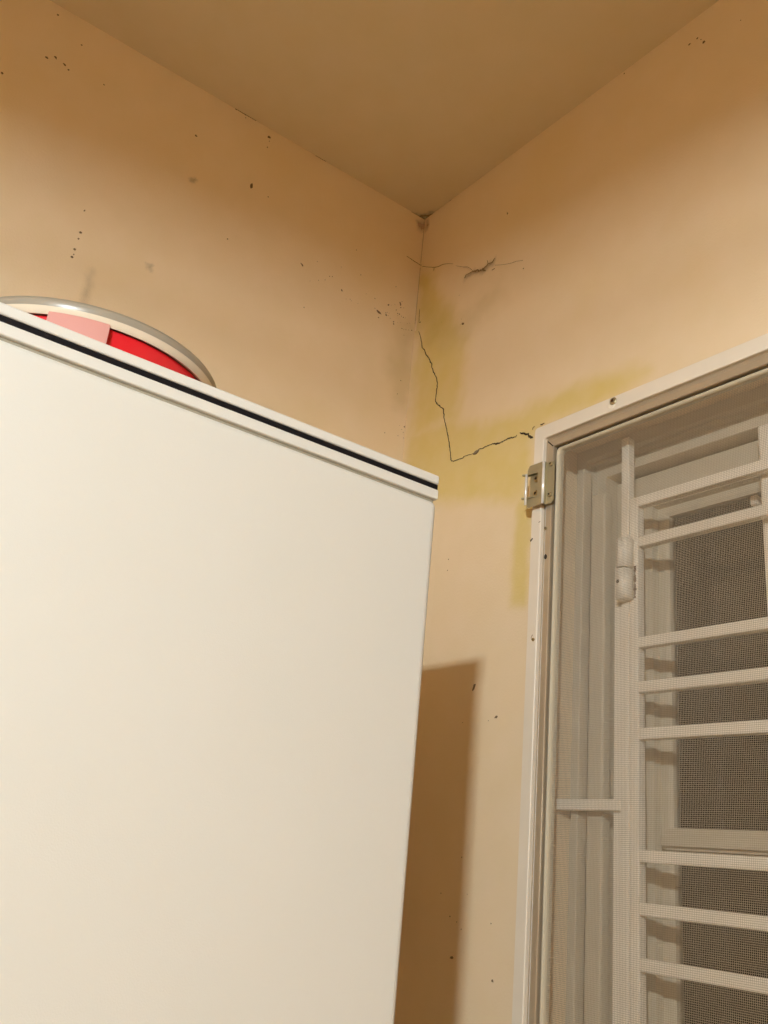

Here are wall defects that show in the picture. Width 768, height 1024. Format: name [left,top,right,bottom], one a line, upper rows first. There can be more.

crack [415,224,544,462]